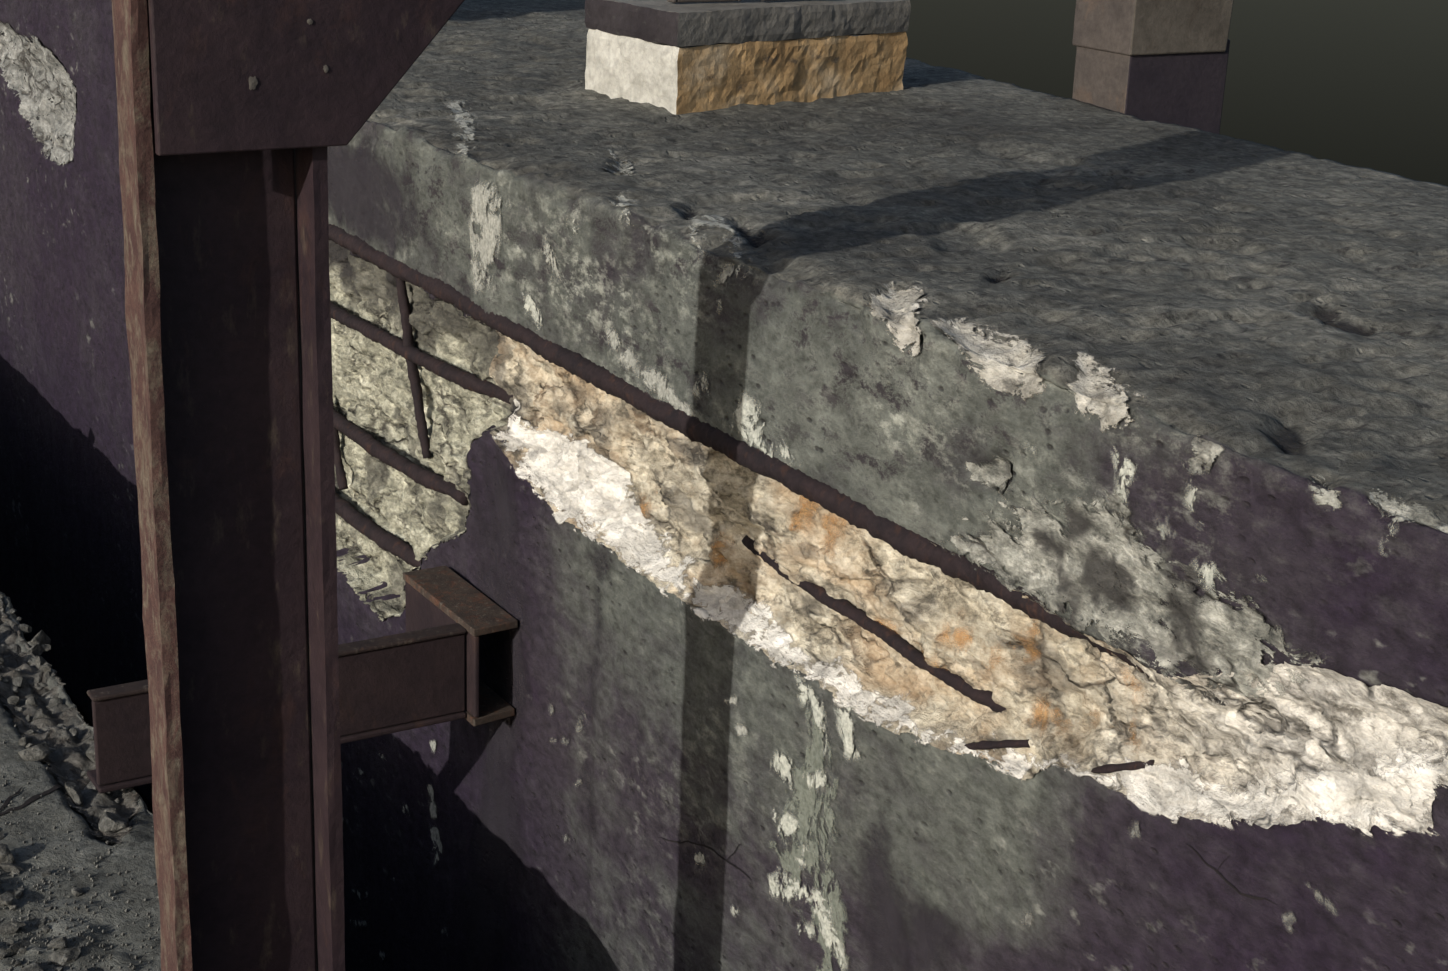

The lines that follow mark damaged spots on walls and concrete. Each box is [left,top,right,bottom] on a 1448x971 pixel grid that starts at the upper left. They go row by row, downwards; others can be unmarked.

spalling [0,22,77,165]
spalling [329,224,1448,836]
water stain [768,677,861,971]